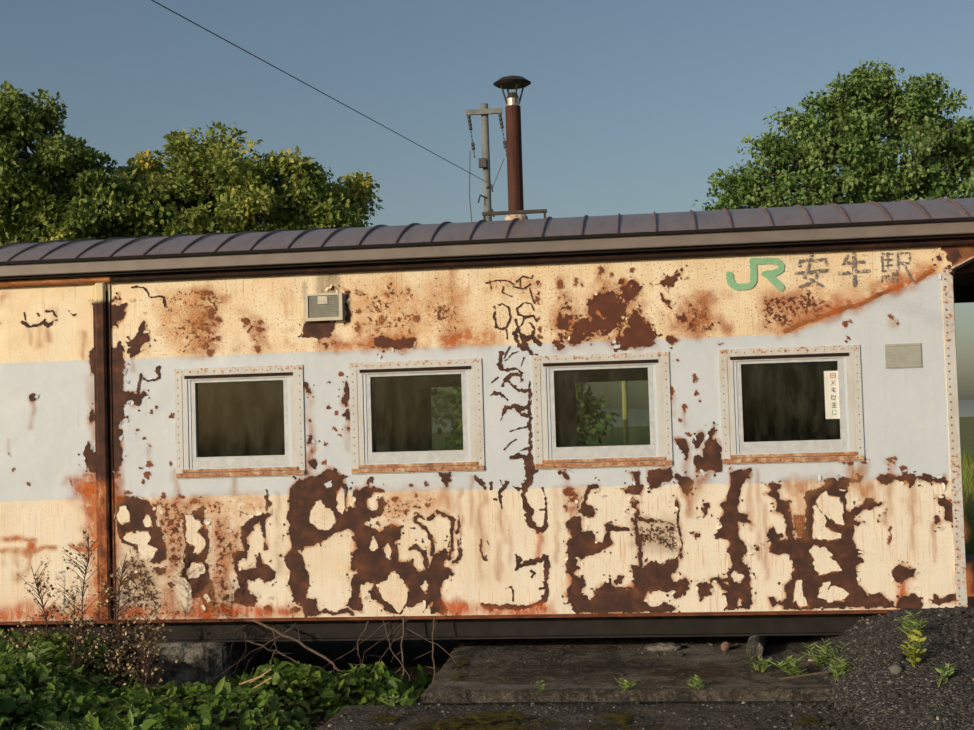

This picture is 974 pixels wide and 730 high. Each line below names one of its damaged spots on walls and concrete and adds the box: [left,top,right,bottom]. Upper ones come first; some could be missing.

peeling [110,292,135,328]
corrosion [163,289,223,357]
peeling [298,284,353,342]
peeling [370,334,416,359]
corrosion [537,266,661,352]
corrosion [763,266,935,343]
peeling [337,376,350,431]
peeling [111,312,216,619]
peeling [232,435,463,618]
peeling [561,421,957,614]